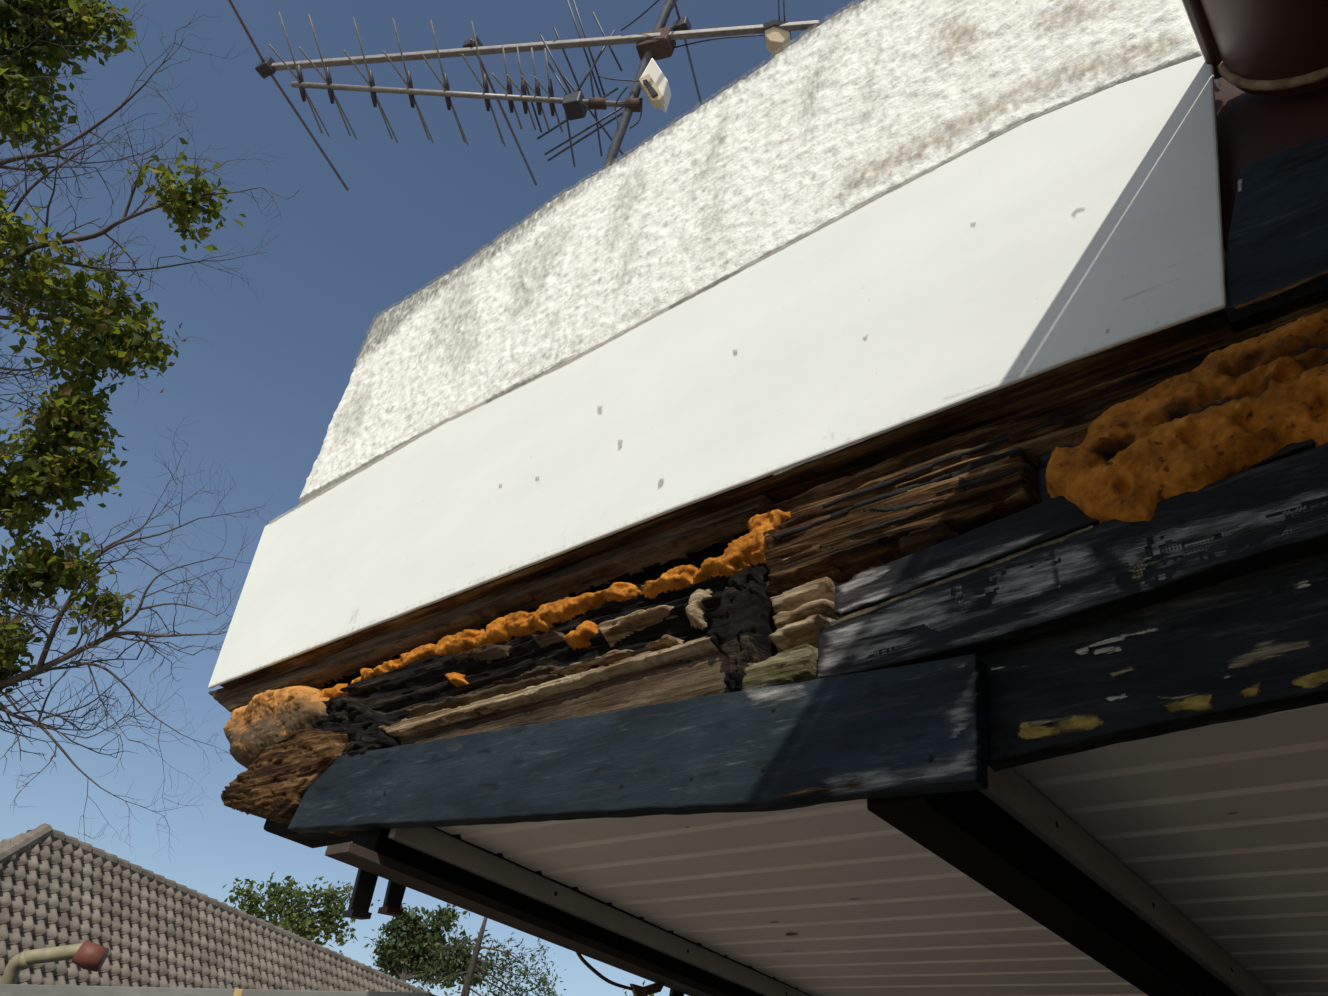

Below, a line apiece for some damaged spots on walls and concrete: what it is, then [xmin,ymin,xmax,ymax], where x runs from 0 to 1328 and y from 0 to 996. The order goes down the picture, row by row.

peeling [1075,628,1158,655]
peeling [1224,641,1310,679]